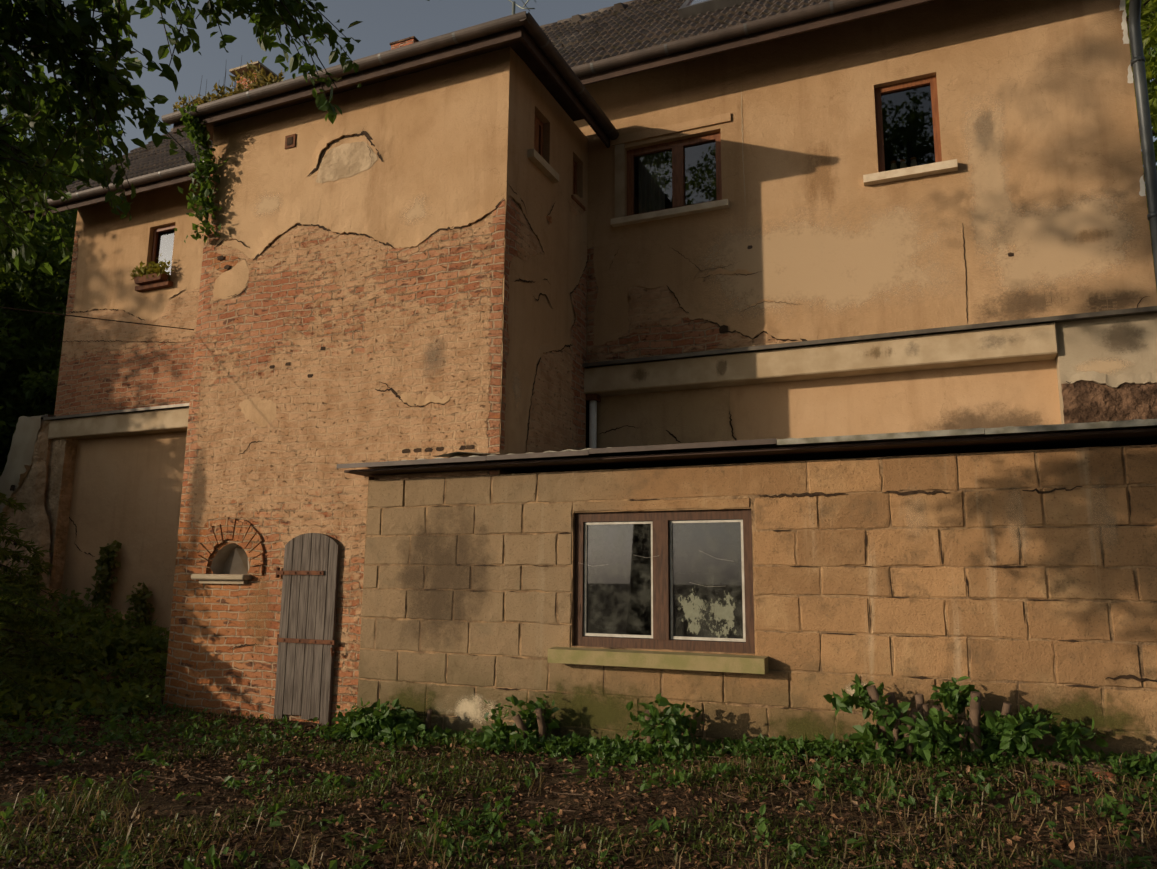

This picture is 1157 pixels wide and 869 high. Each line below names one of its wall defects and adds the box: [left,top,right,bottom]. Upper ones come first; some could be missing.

flaking render [522,246,818,453]
crack [375,382,451,407]
flaking render [1061,370,1157,424]
flaking render [0,152,555,725]
crack [1105,674,1157,682]